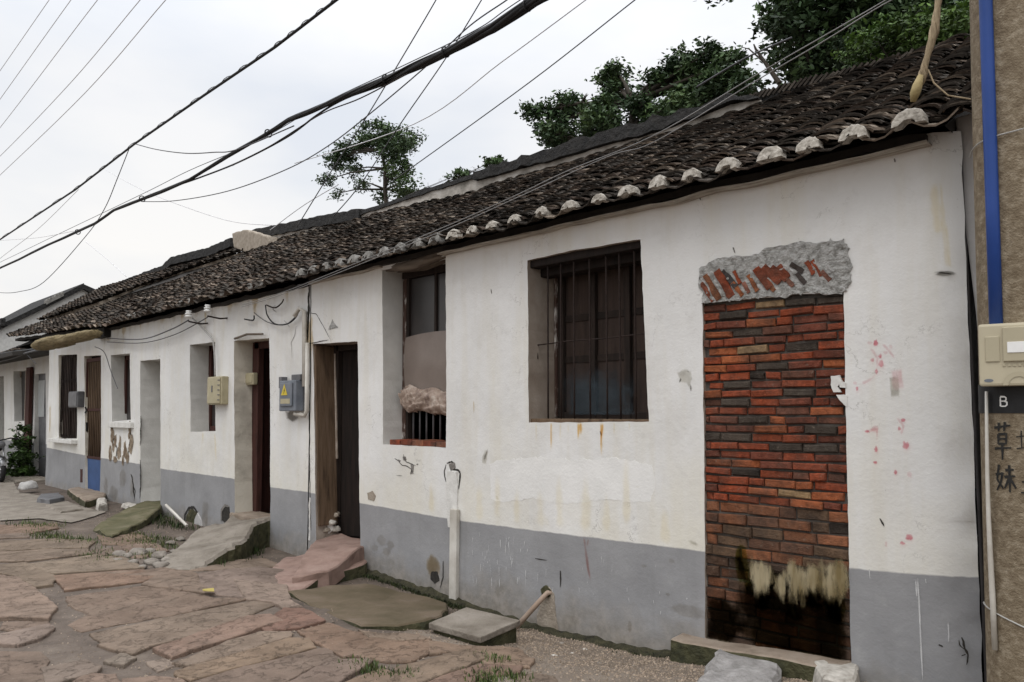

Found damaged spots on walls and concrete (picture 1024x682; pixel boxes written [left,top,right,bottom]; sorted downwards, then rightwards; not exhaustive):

peeling [109,416,142,499]
damp [707,556,846,660]